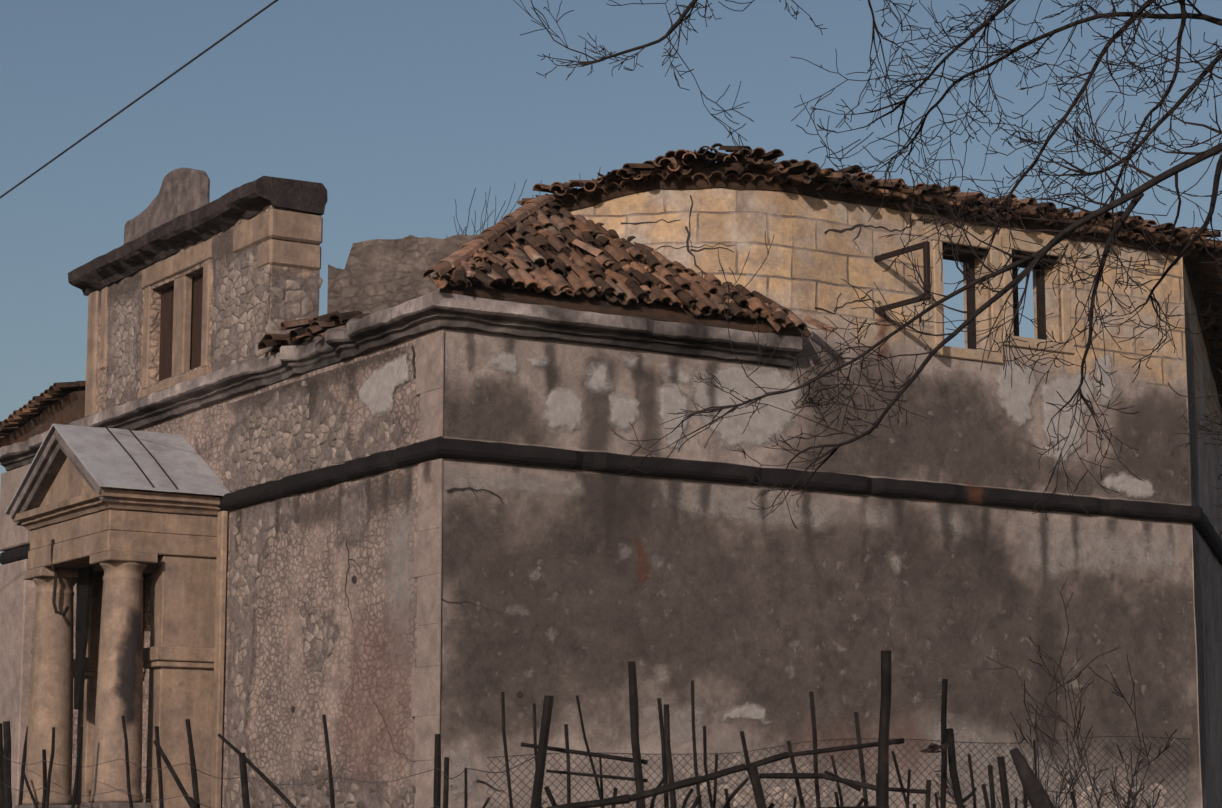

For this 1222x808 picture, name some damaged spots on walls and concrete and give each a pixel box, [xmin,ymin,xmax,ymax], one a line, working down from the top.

peeling [359,354,409,416]
leakage [443,383,541,444]
peeling [490,353,547,374]
peeling [544,364,640,433]
leakage [588,361,611,450]
leakage [633,355,657,456]
peeling [658,364,799,448]
leakage [791,309,1199,506]
peeling [1102,472,1154,498]
leakage [116,610,141,722]
leakage [440,473,1206,787]